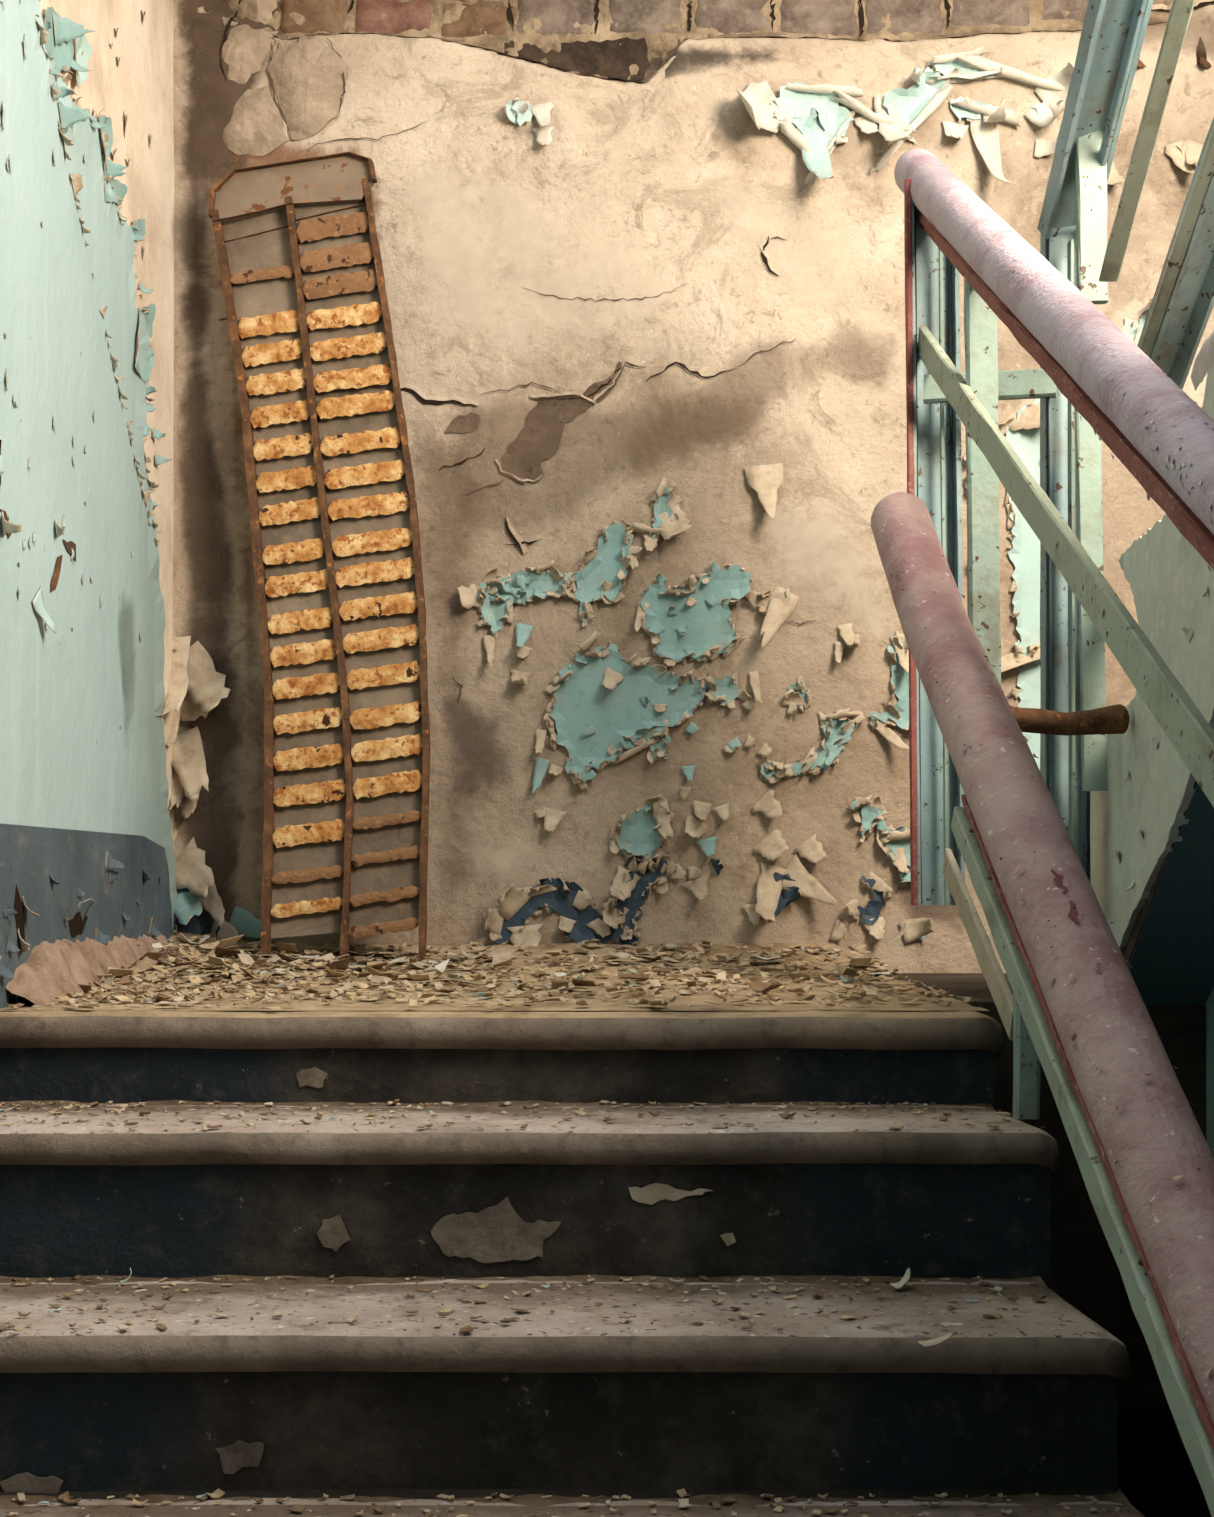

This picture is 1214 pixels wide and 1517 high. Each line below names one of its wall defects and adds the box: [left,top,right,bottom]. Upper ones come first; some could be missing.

flaking render [261,0,1089,195]
flaking render [1196,37,1211,68]
peeling [23,0,172,551]
peeling [18,516,103,634]
water stain [180,0,282,923]
flaking render [495,361,626,484]
peeling [745,463,783,521]
peeling [0,632,261,1006]
peeling [457,477,799,947]
peeling [723,630,935,943]
peeling [431,1197,561,1263]
peeling [628,1183,714,1205]